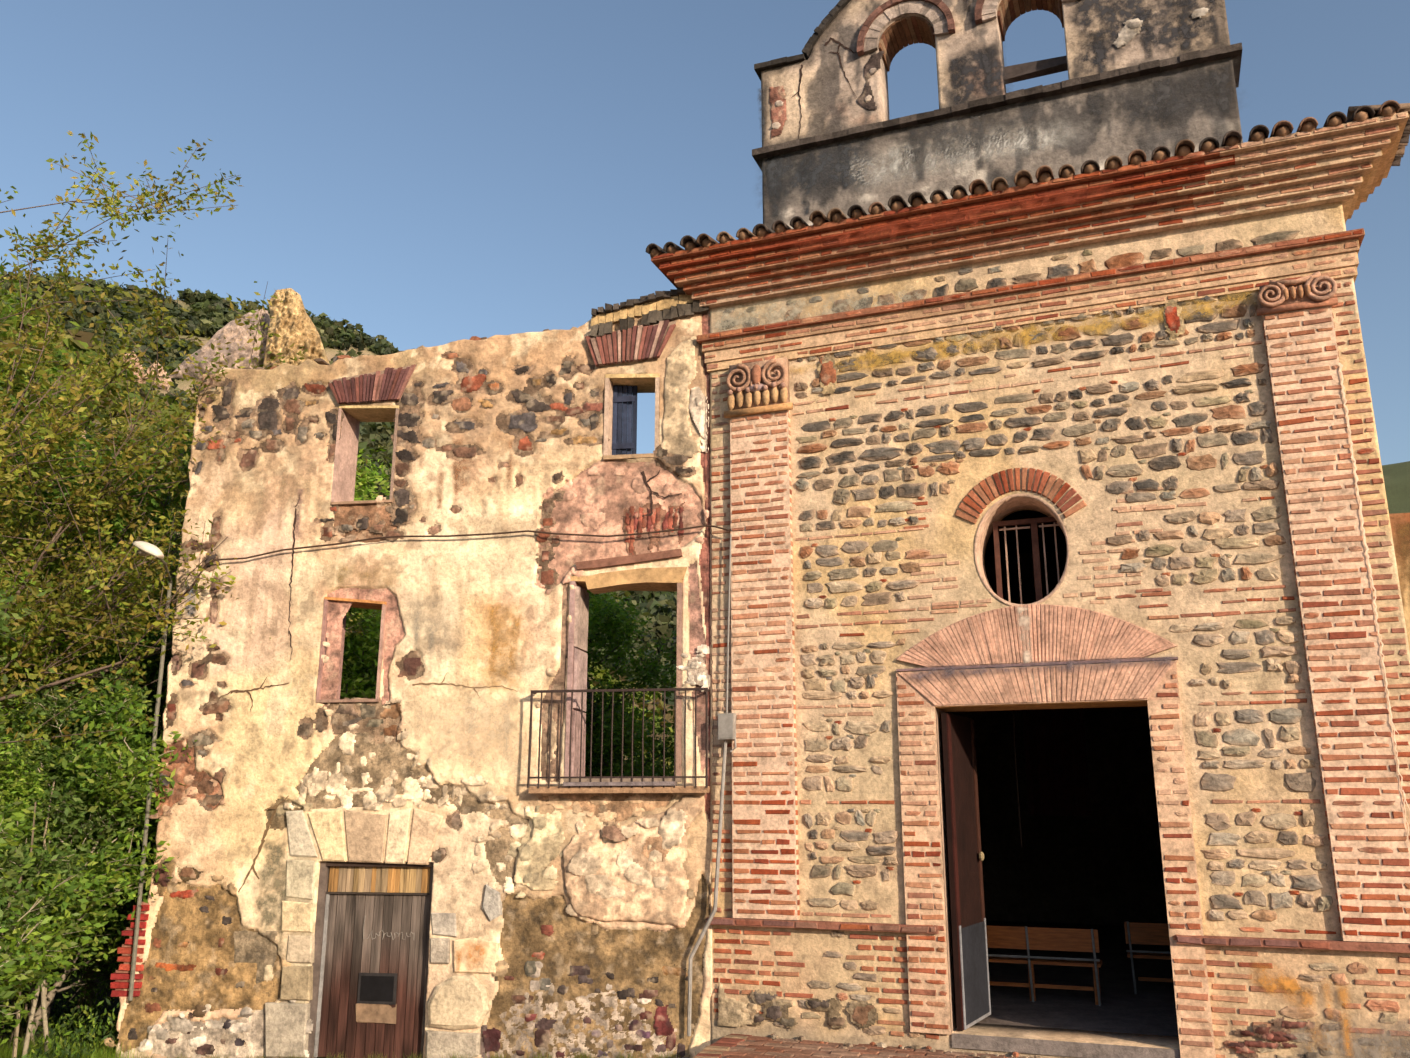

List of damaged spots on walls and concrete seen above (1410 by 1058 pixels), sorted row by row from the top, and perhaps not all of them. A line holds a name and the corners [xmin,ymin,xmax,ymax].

mould [1072,0,1218,73]
crack [791,37,857,139]
damp [763,49,1054,216]
mould [1087,67,1230,132]
spalling [192,374,344,475]
flaking render [266,310,878,1058]
flaking render [104,858,296,1058]